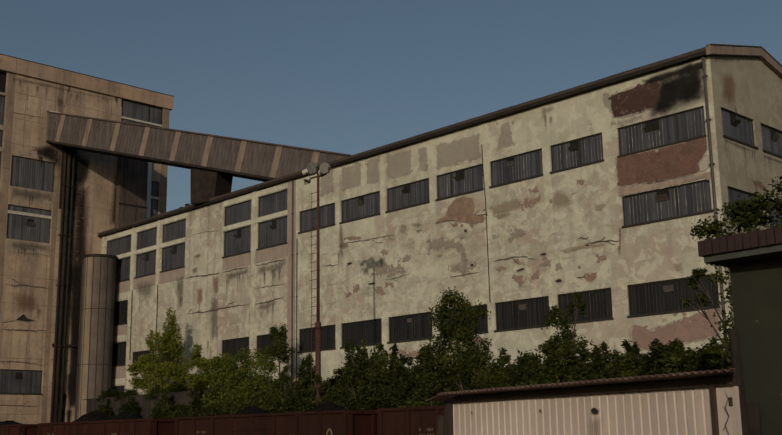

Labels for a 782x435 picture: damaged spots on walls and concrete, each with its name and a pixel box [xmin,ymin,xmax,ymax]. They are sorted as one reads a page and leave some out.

flaking render [603,81,660,126]
leakage [644,62,702,112]
leakage [75,157,88,197]
flaking render [615,137,711,196]
flaking render [426,195,486,278]
crack [578,232,620,245]
peeling [345,249,411,297]
crack [453,256,535,281]
flaking render [629,308,722,351]
crack [723,391,733,435]